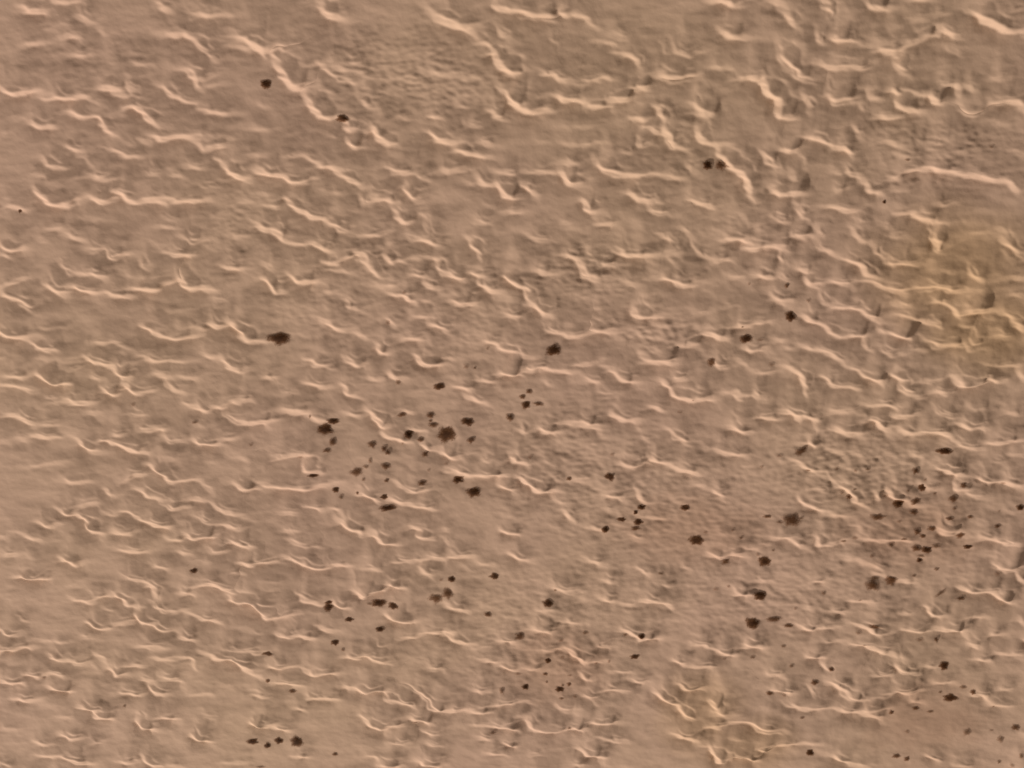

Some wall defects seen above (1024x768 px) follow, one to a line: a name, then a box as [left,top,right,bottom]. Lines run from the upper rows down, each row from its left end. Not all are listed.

damp [309,416,338,452]
damp [427,413,474,443]
damp [351,442,390,494]
damp [453,476,480,497]
damp [577,465,1024,600]
damp [483,590,1021,768]